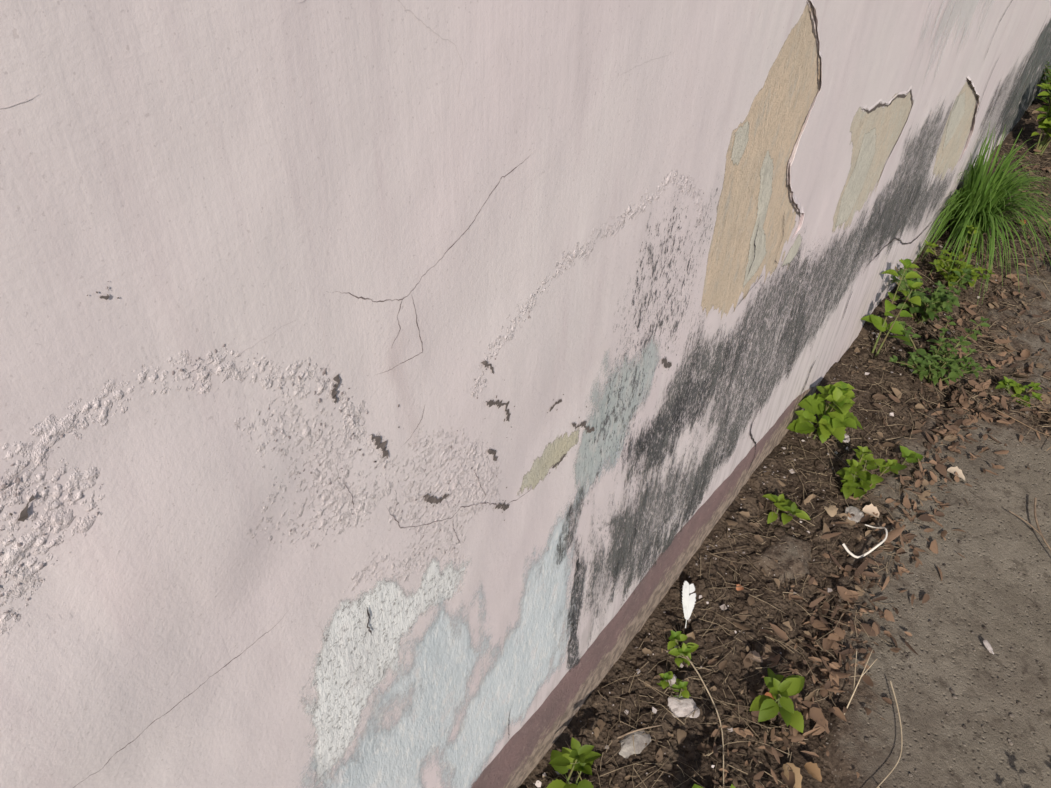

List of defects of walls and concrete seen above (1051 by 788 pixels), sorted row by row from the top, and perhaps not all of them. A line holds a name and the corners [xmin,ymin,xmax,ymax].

crack [331,153,532,375]
peeling [701,0,822,318]
peeling [832,86,914,233]
peeling [933,76,980,181]
peeling [495,406,594,521]
leakage [556,100,954,668]
peeling [301,559,468,783]